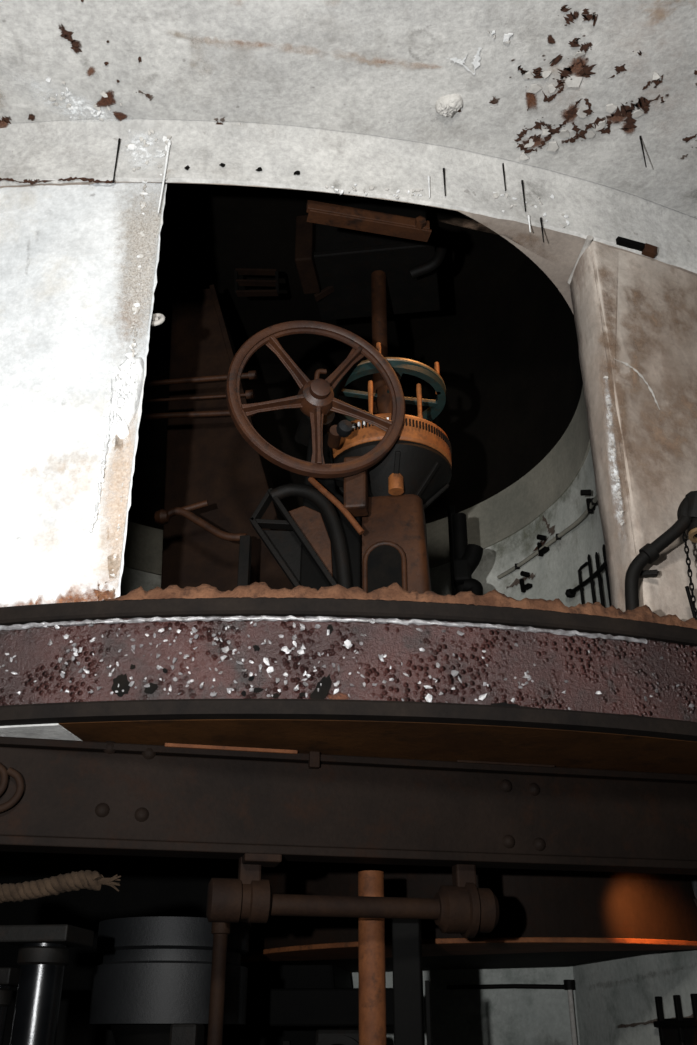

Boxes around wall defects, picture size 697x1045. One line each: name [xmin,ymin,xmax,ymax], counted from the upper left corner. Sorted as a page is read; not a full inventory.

crack [0,116,12,128]
crack [0,177,115,185]